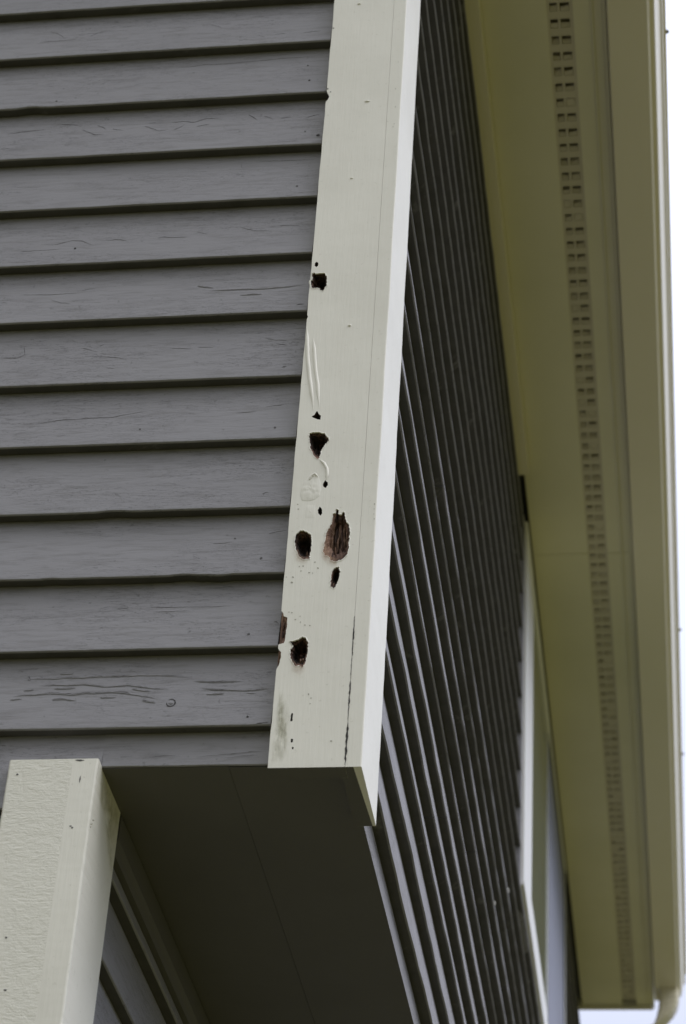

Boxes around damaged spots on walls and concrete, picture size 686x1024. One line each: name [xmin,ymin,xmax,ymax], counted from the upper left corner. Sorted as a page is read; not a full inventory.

peeling [291,508,351,590]
peeling [289,612,311,668]
crack [344,616,355,763]